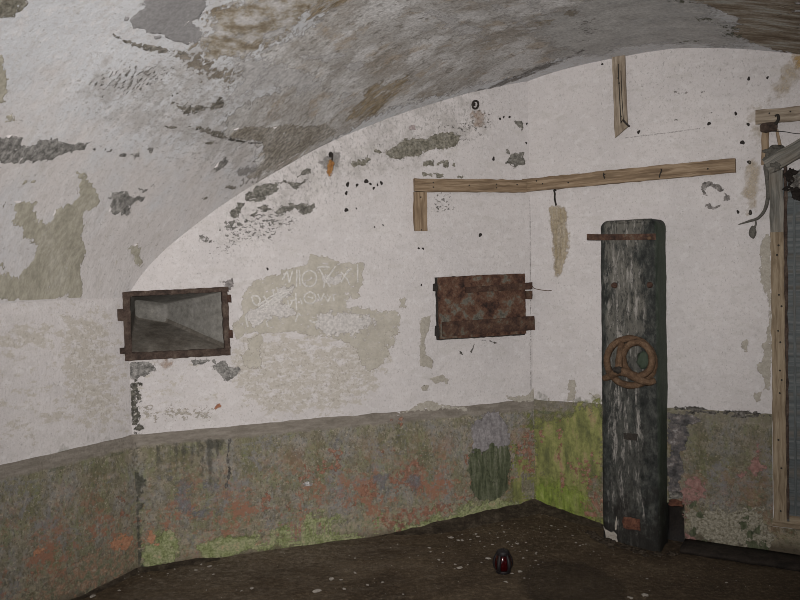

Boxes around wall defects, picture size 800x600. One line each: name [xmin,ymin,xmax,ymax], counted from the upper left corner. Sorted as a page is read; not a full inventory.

spalling [113,0,210,55]
peeling [0,134,154,164]
peeling [169,0,593,255]
peeling [0,171,154,302]
peeling [191,254,407,382]
leakage [130,379,146,434]
leakage [467,410,512,503]